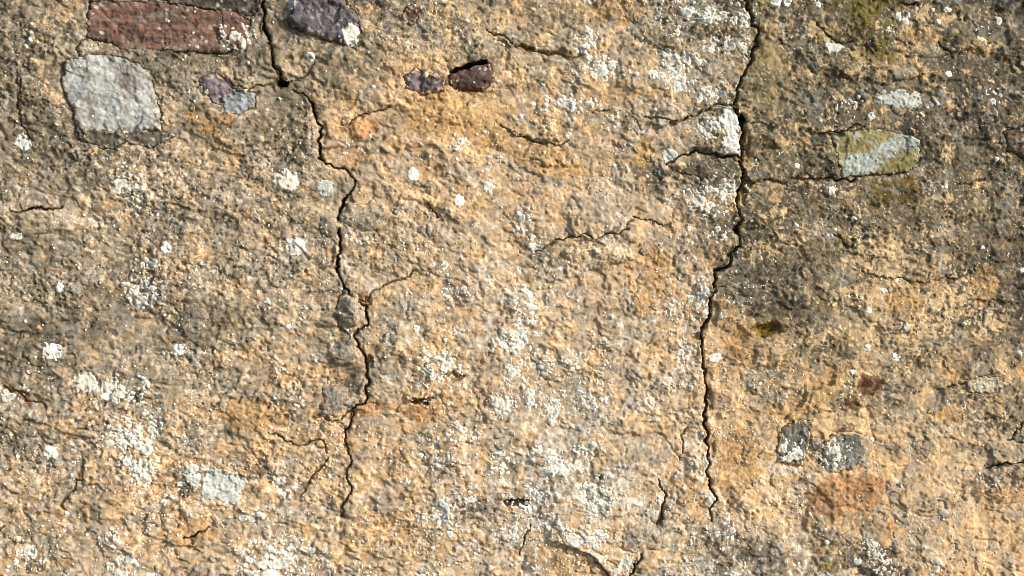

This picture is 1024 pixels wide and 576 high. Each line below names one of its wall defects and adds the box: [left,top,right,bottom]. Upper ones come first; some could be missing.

crack [233,0,414,518]
crack [644,0,892,526]
crack [594,553,643,576]